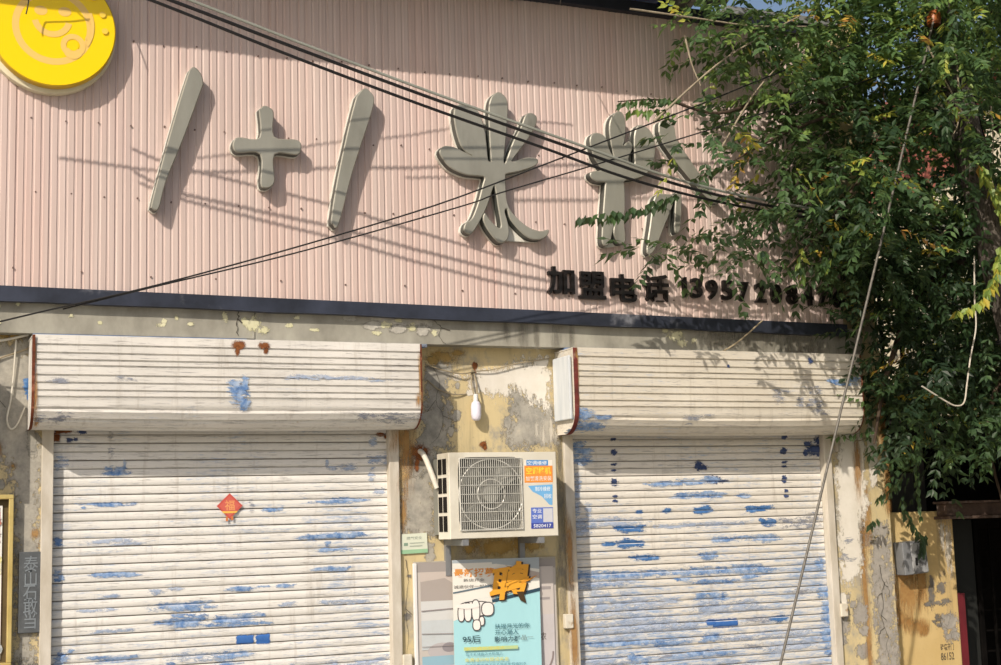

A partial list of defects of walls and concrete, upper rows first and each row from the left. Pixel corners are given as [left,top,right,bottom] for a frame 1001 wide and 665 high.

rust [232,340,245,356]
peeling [226,374,253,412]
peeling [286,374,386,382]
peeling [0,336,75,665]
peeling [102,434,132,476]
peeling [296,531,371,552]
peeling [315,435,387,505]
peeling [358,352,901,665]
peeling [86,654,137,664]
peeling [147,586,273,665]
crack [877,565,890,656]
damp [906,522,952,635]